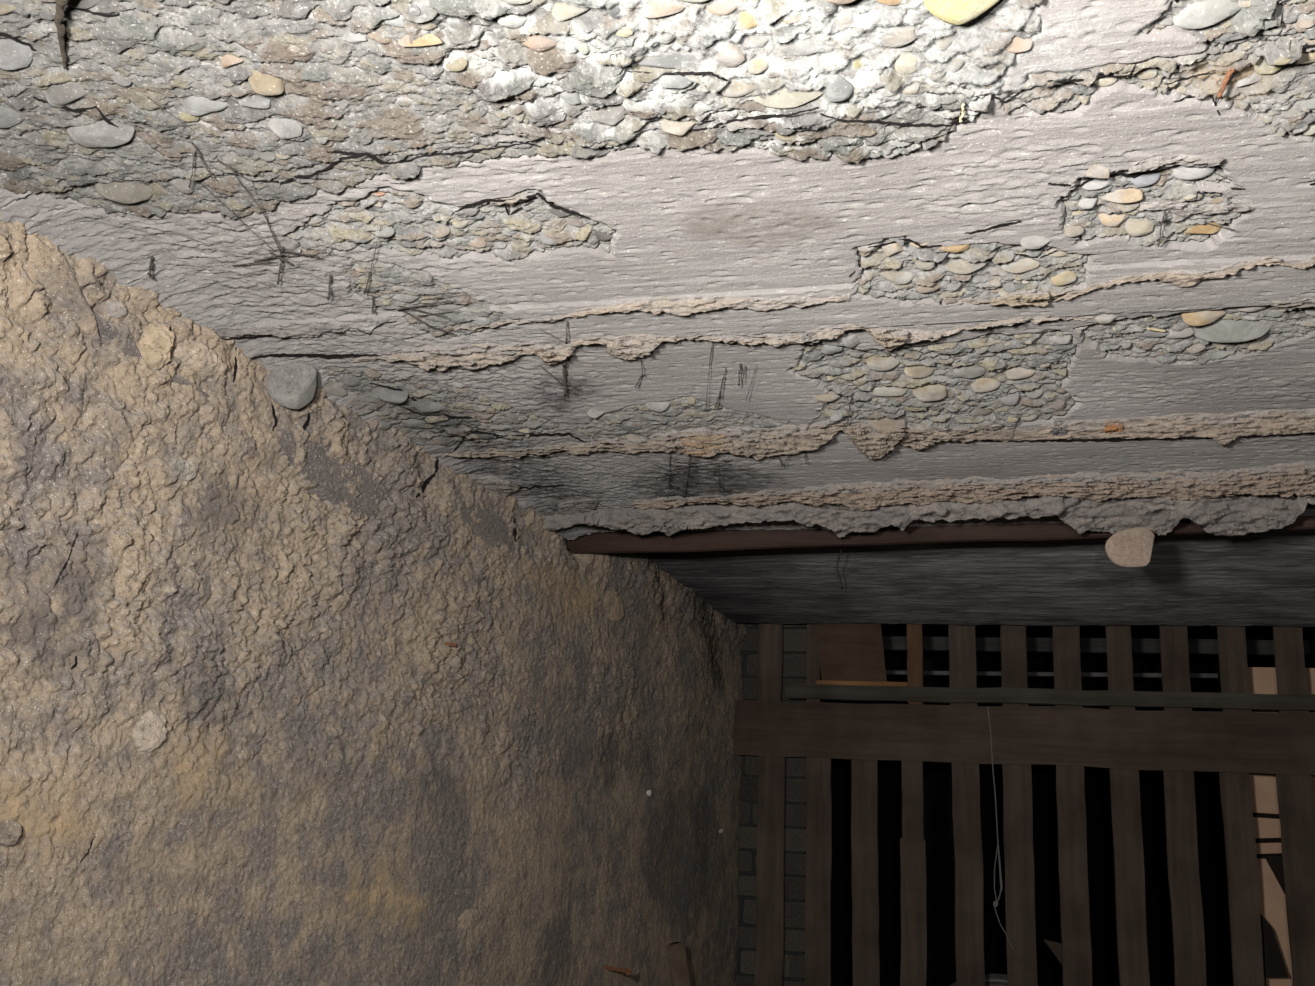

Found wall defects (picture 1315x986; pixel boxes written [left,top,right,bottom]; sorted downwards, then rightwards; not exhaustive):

spalling [0,0,1315,339]
spalling [323,366,583,496]
peeling [537,346,574,365]
spalling [577,305,1315,460]
spalling [531,494,1315,538]